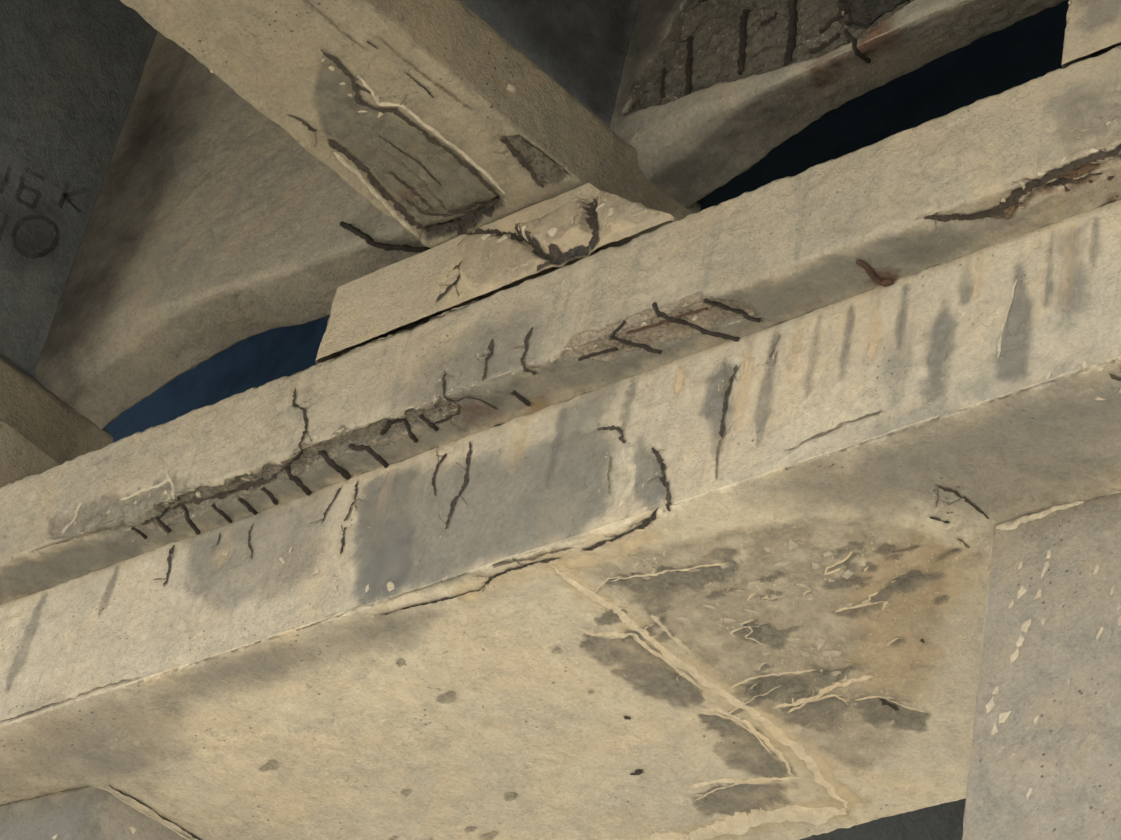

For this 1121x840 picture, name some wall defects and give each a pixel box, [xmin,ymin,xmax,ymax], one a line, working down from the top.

spalling [624,0,913,115]
spalling [316,66,505,253]
crack [288,0,615,362]
crack [474,327,541,381]
spalling [550,293,761,363]
damp [927,310,954,398]
damp [997,276,1029,379]
spalling [50,396,455,539]
damp [202,439,383,515]
crack [431,371,473,529]
crack [382,425,671,615]
damp [878,385,1121,481]